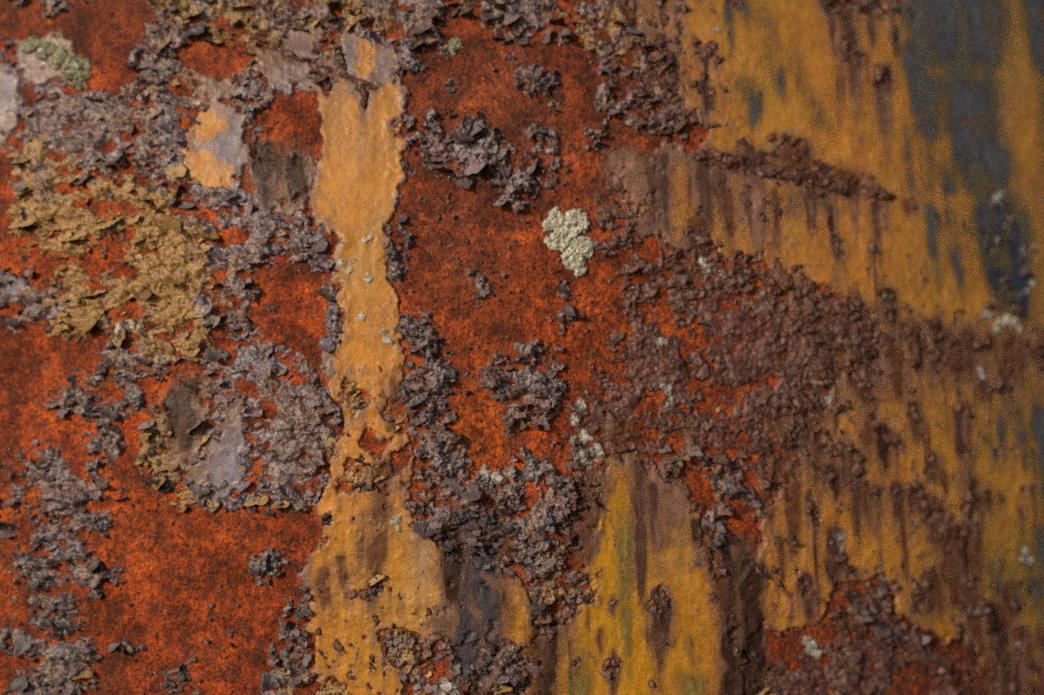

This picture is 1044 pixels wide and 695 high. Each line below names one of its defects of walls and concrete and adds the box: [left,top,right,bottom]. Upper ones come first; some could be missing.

rust [604,0,730,139]
rust [249,140,307,206]
rust [606,138,858,278]
peeling [0,0,352,695]
peeling [280,0,892,632]
leakage [989,402,1044,505]
rust [315,450,406,609]
peeling [368,607,541,695]
leakage [440,508,510,691]
leakage [618,531,630,654]
peeling [749,550,1003,695]
leakage [1027,525,1044,621]